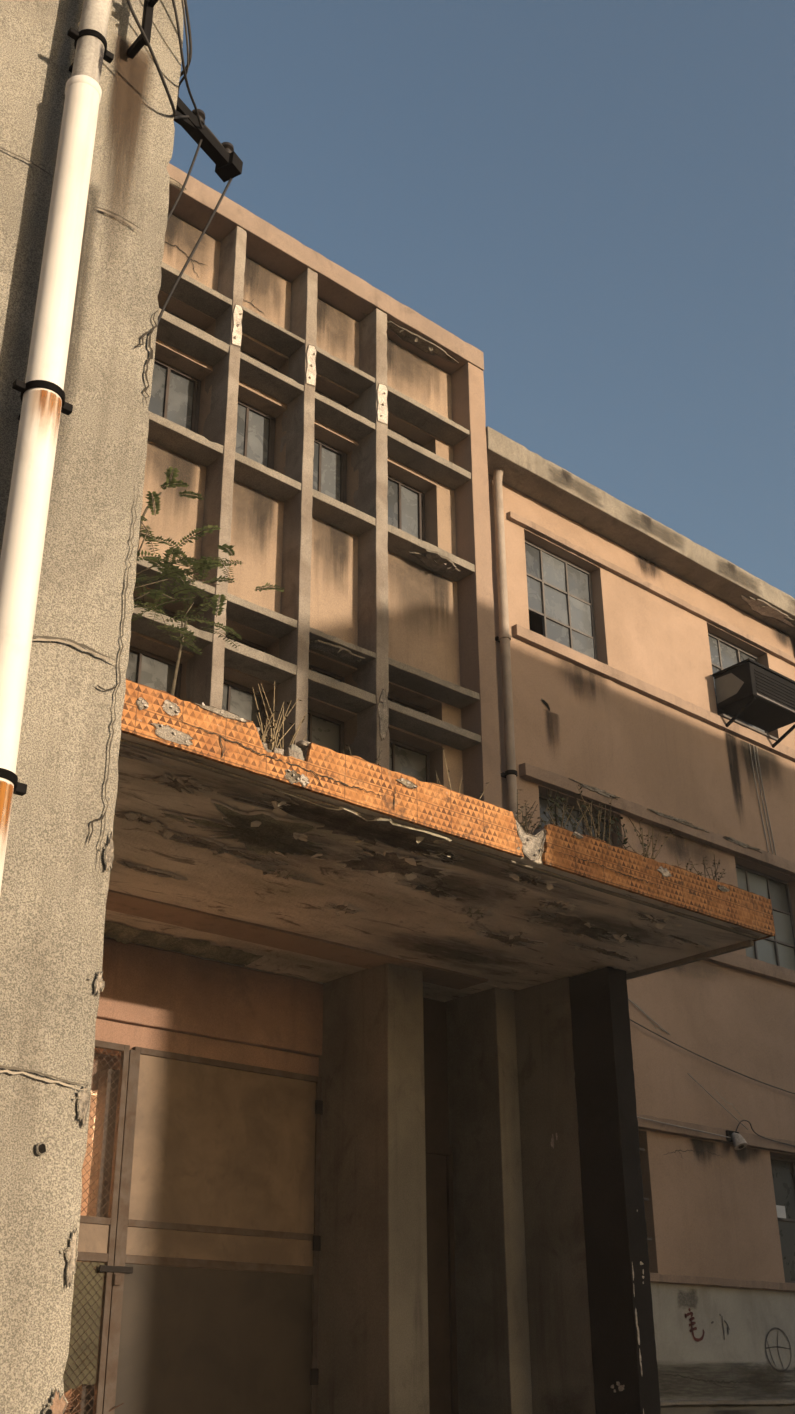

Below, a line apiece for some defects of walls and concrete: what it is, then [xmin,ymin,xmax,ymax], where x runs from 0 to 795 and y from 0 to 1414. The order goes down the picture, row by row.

crack [135,310,158,404]
corrosion [40,390,62,417]
crack [32,495,138,879]
water stain [725,733,777,794]
corrosion [0,781,13,831]
peeling [498,816,570,890]
peeling [468,909,642,961]
spalling [632,1261,644,1375]